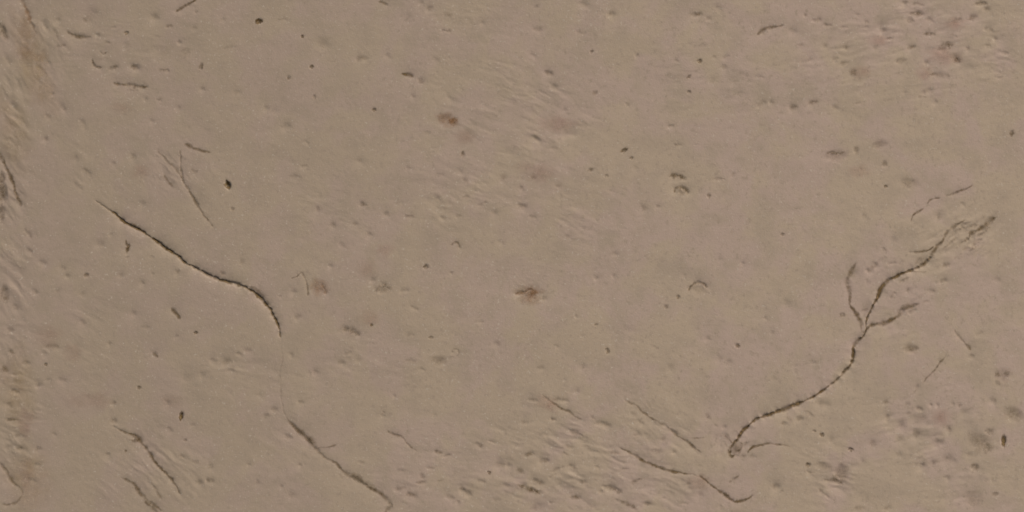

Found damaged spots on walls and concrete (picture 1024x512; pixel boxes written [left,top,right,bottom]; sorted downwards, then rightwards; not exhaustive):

crack [112,212,281,337]
crack [730,239,944,457]